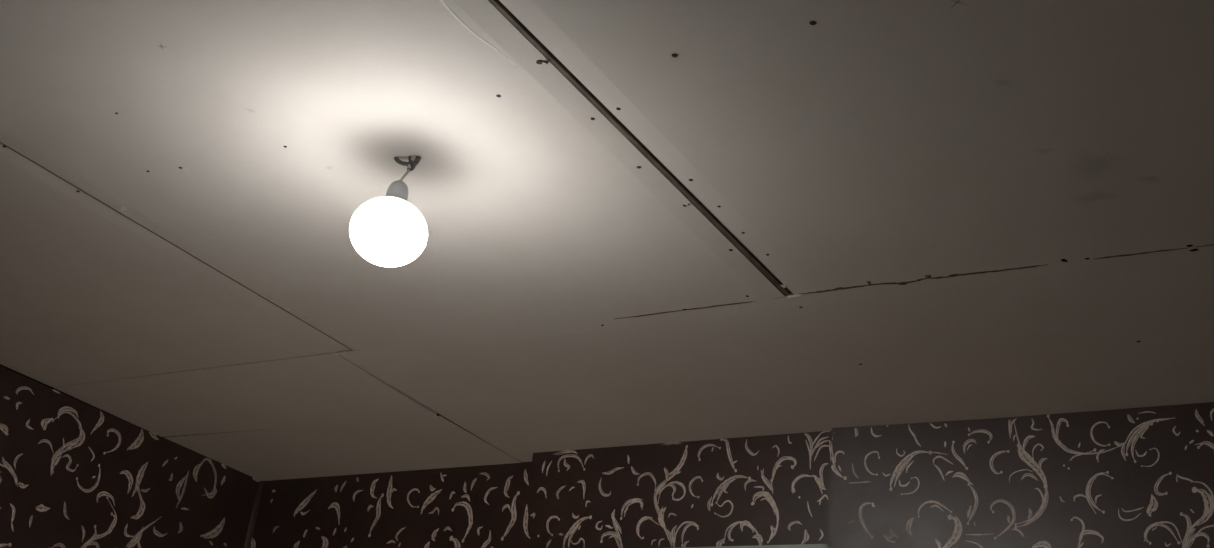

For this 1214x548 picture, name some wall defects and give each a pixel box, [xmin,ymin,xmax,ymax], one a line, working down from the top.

crack [1095,244,1214,259]
crack [802,264,1048,294]